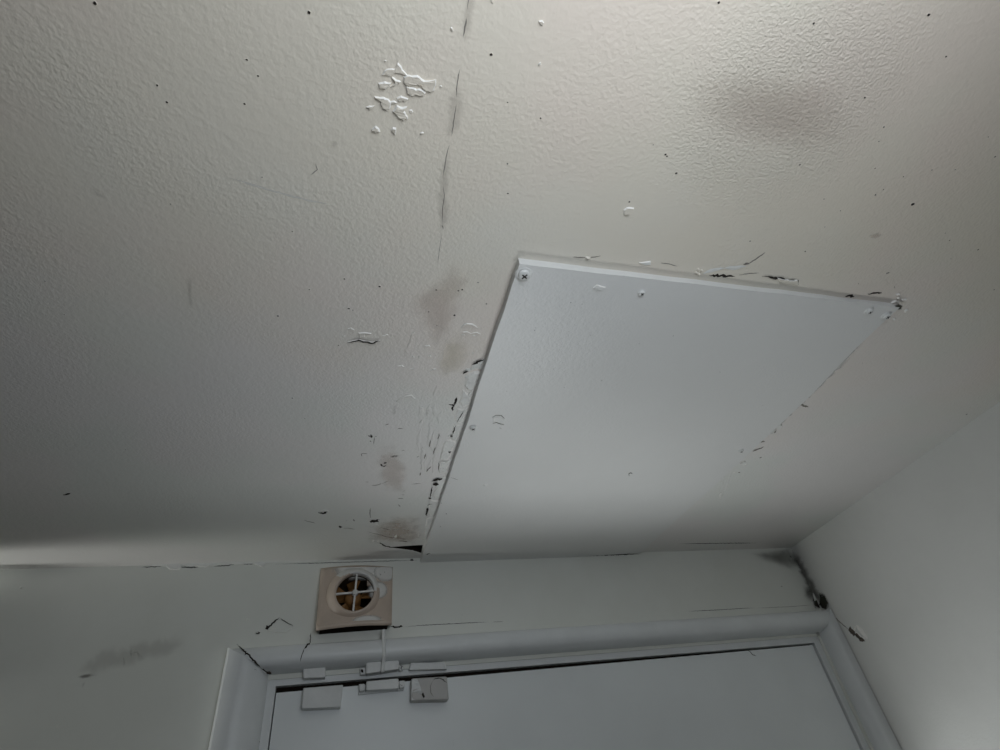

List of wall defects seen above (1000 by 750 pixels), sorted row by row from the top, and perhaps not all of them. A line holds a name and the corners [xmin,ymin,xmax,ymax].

peeling [367,60,442,134]
crack [438,69,460,259]
peeling [762,276,799,286]
peeling [338,328,388,346]
leakage [813,593,828,610]
crack [237,644,271,674]